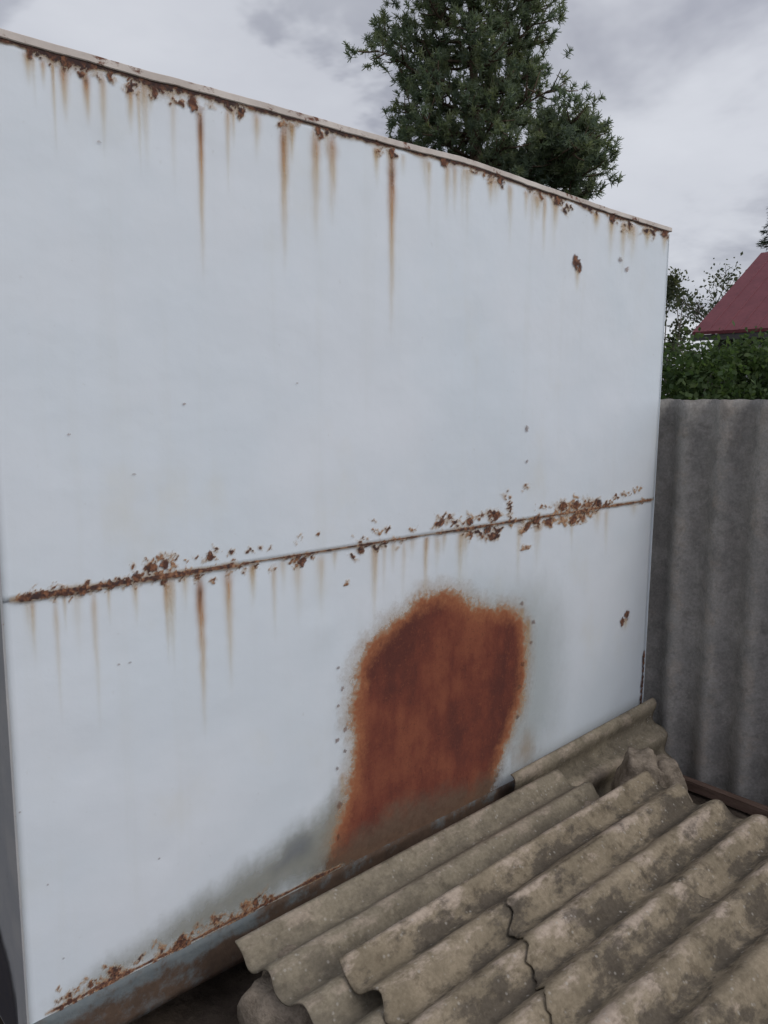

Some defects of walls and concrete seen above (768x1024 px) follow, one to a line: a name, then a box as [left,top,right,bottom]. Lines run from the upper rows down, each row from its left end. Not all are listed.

rust [0,38,669,240]
rust [12,486,652,635]
rust [47,588,530,1014]